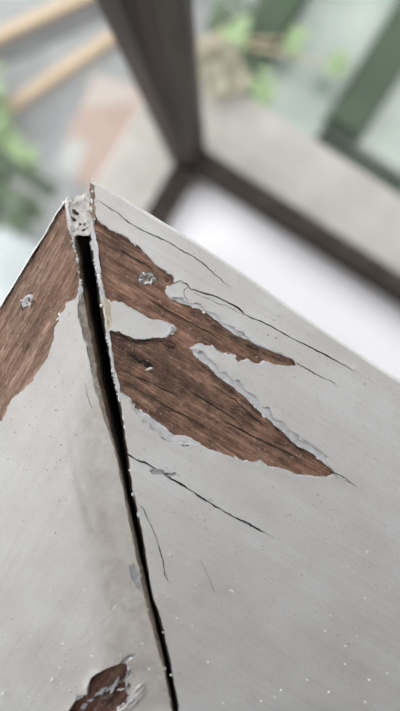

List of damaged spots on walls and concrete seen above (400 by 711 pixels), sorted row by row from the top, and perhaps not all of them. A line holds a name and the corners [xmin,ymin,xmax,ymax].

peeling [0,201,83,423]
peeling [88,179,334,478]
crack [101,202,352,370]
crack [76,224,264,708]
peeling [69,654,144,711]